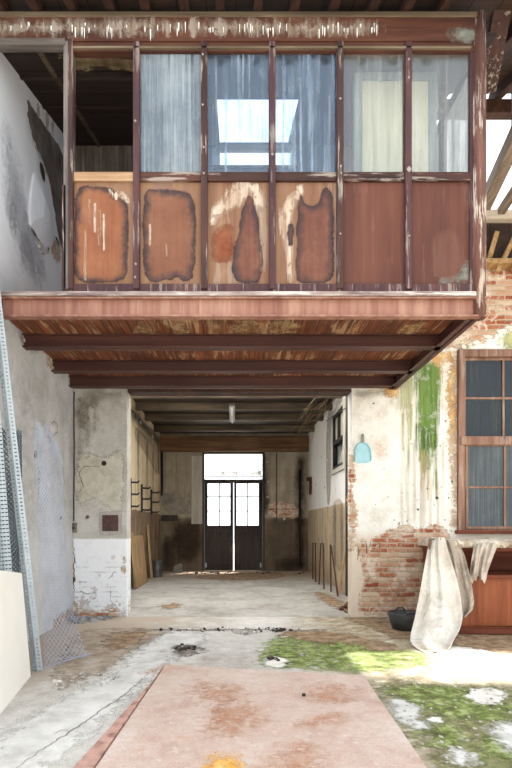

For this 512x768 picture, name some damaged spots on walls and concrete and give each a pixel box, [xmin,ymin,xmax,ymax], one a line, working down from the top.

flaking render [27,100,63,261]
peeling [233,320,299,334]
flaking render [346,270,512,617]